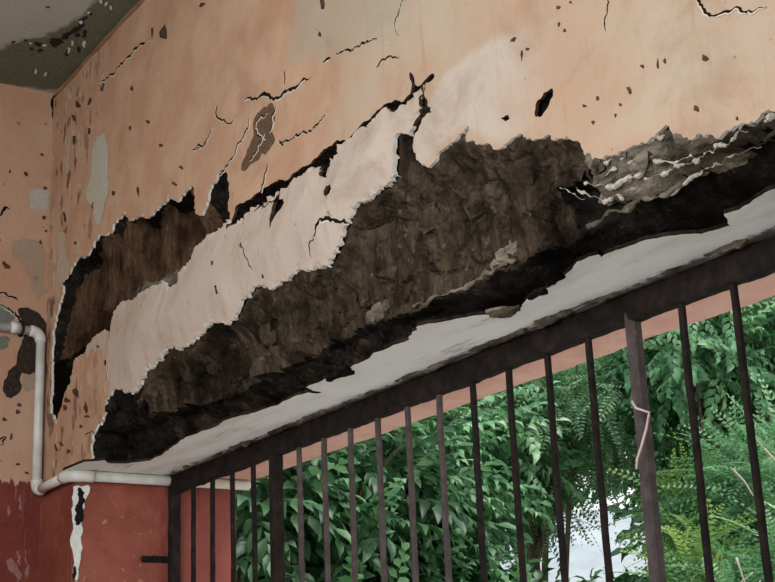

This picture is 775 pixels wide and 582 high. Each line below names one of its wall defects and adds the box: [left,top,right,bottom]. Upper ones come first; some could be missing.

peeling [11,12,92,56]
peeling [151,25,167,39]
crack [696,0,767,18]
crack [363,74,434,127]
flaking render [538,91,553,117]
crack [192,0,405,270]
flaking render [0,128,238,428]
flaking render [93,99,775,461]
crack [0,292,20,322]
flaking render [70,485,90,580]